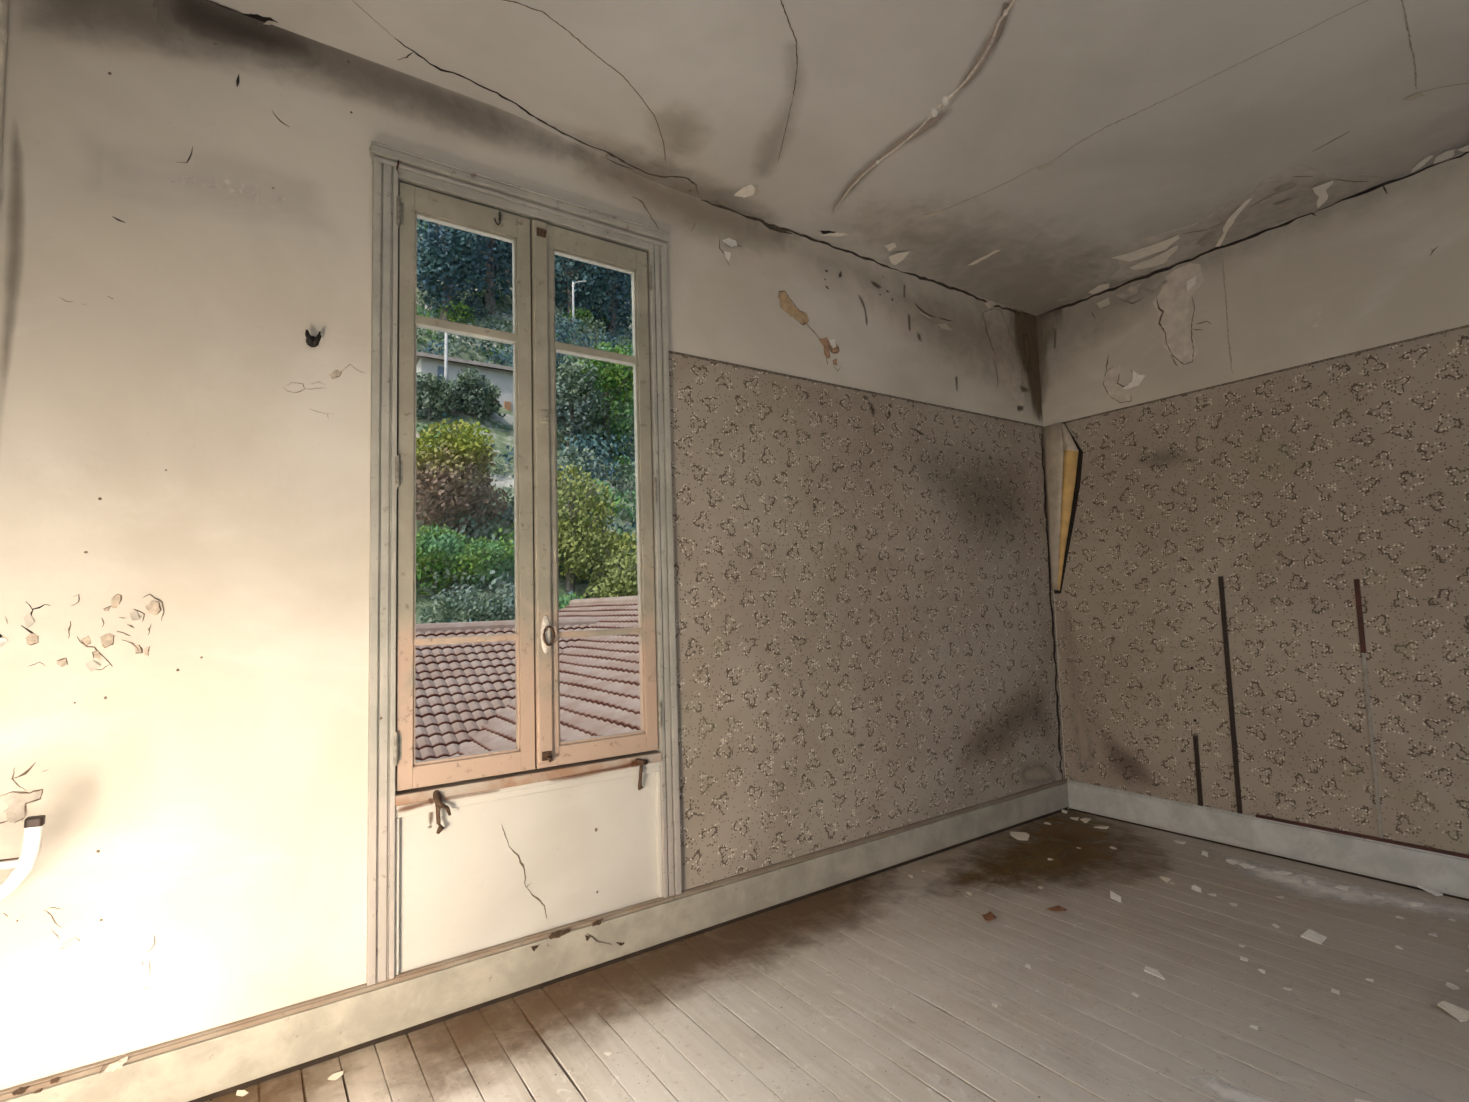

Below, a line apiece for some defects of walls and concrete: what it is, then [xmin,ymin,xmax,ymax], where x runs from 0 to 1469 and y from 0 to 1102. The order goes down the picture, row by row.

crack [352,0,1469,373]
peeling [1411,145,1469,173]
peeling [1053,164,1386,368]
flaking render [778,291,841,371]
flaking render [101,594,164,656]
crack [502,826,547,918]
damp [950,809,1165,886]